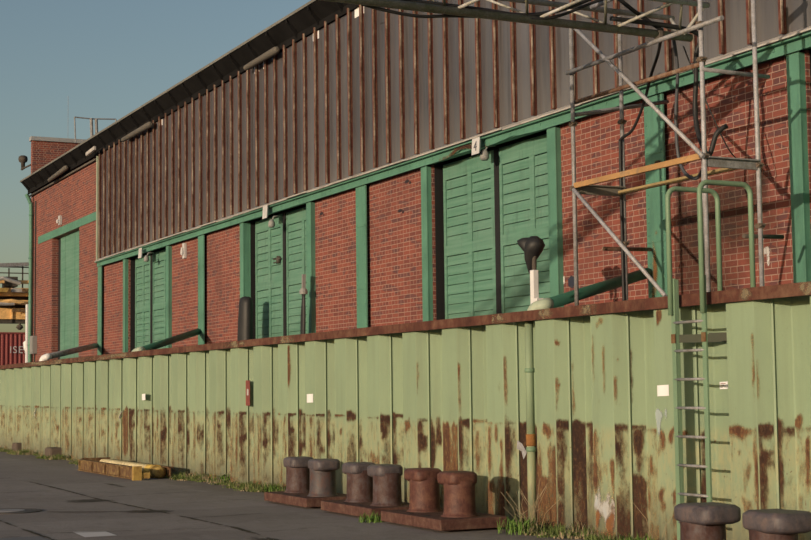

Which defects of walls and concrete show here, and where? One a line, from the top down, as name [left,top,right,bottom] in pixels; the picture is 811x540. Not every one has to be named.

corrosion [51,406,687,540]
peeling [594,489,615,534]
corrosion [729,415,802,510]
corrosion [800,437,810,487]